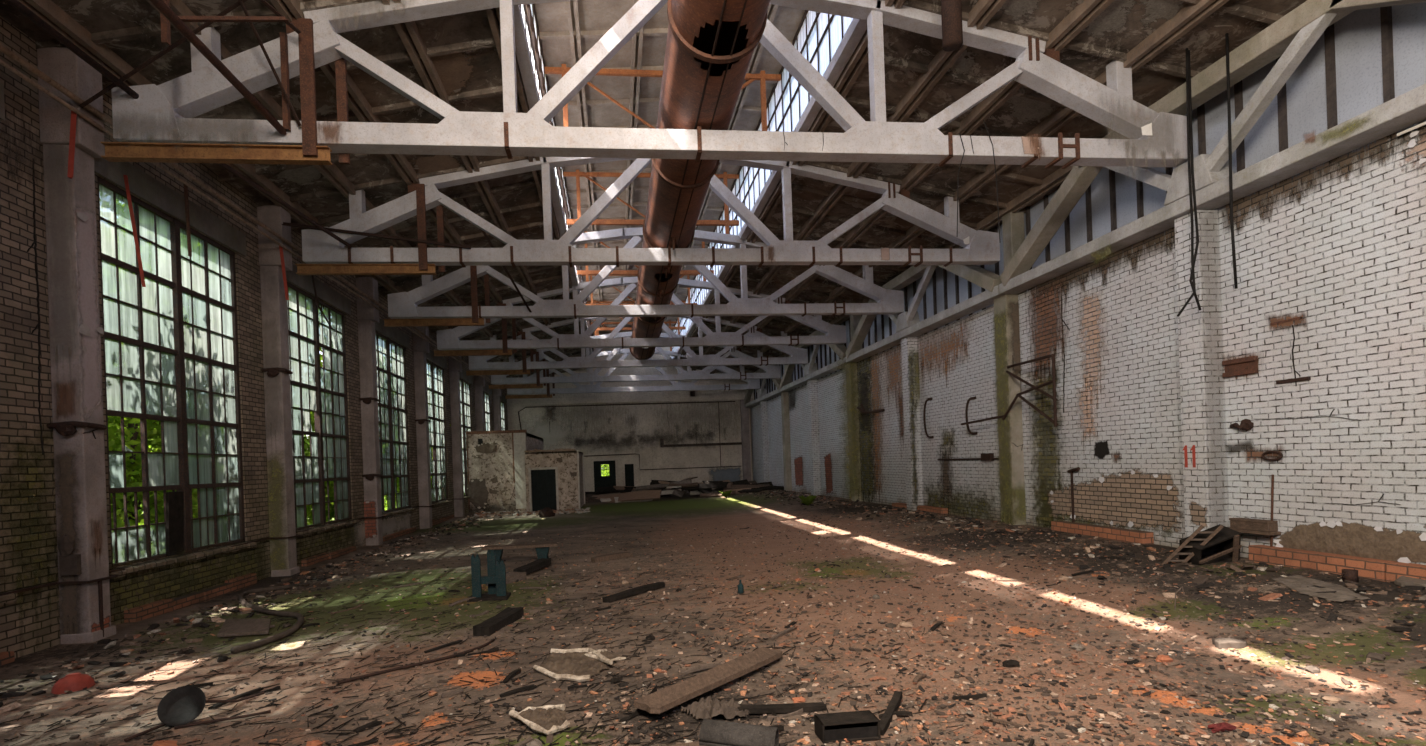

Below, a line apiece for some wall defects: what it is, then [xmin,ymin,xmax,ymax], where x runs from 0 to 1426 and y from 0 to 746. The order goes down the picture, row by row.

leakage [1224,120,1426,231]
peeling [1402,131,1426,171]
rust [1028,280,1065,394]
rust [1080,297,1100,436]
peeling [1048,441,1207,532]
spalling [1273,519,1426,564]